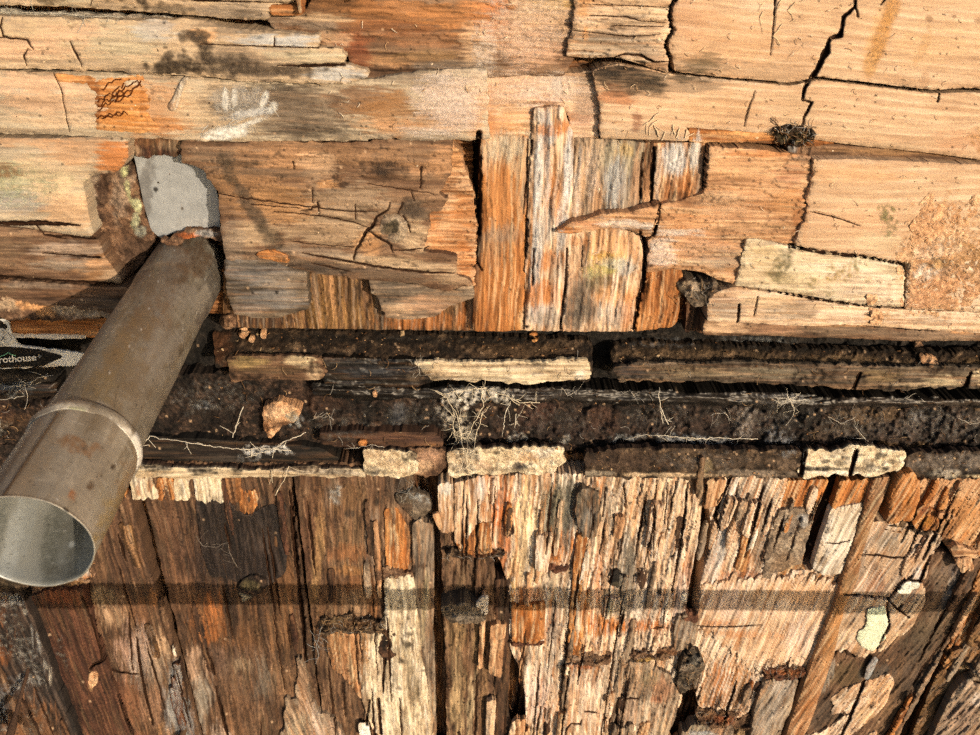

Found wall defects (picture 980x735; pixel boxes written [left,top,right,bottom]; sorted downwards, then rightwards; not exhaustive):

crack [574,0,763,127]
crack [769,0,777,55]
crack [802,0,977,129]
crack [219,166,455,274]
crack [473,132,482,270]
crack [632,147,661,329]
crack [262,490,316,689]
crack [329,562,403,735]
peeling [856,605,889,651]
peeling [897,581,920,594]